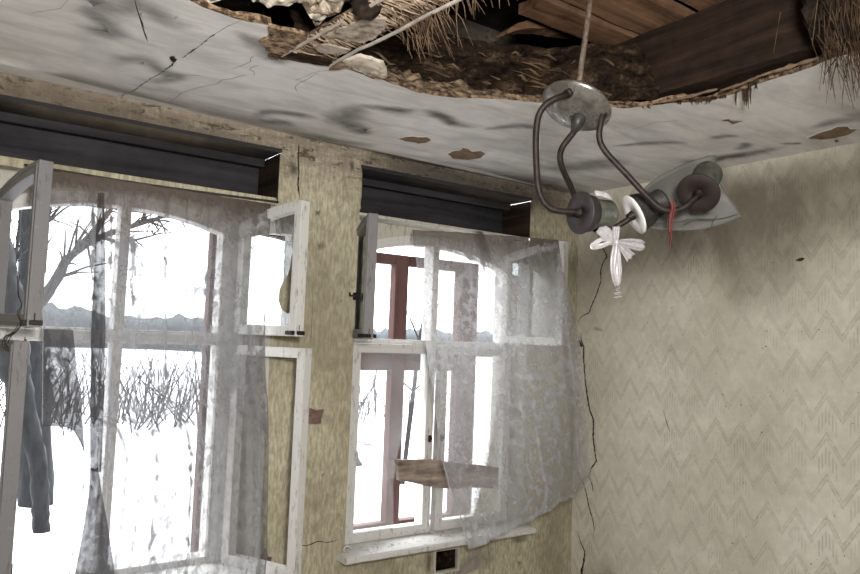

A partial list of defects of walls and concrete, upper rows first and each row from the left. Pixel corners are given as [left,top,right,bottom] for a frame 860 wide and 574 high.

crack [120,23,259,103]
spalling [190,0,542,103]
spalling [609,47,858,109]
peeling [397,135,433,144]
peeling [446,147,486,160]
peeling [806,125,859,142]
peeling [308,406,325,426]
crack [578,235,607,574]